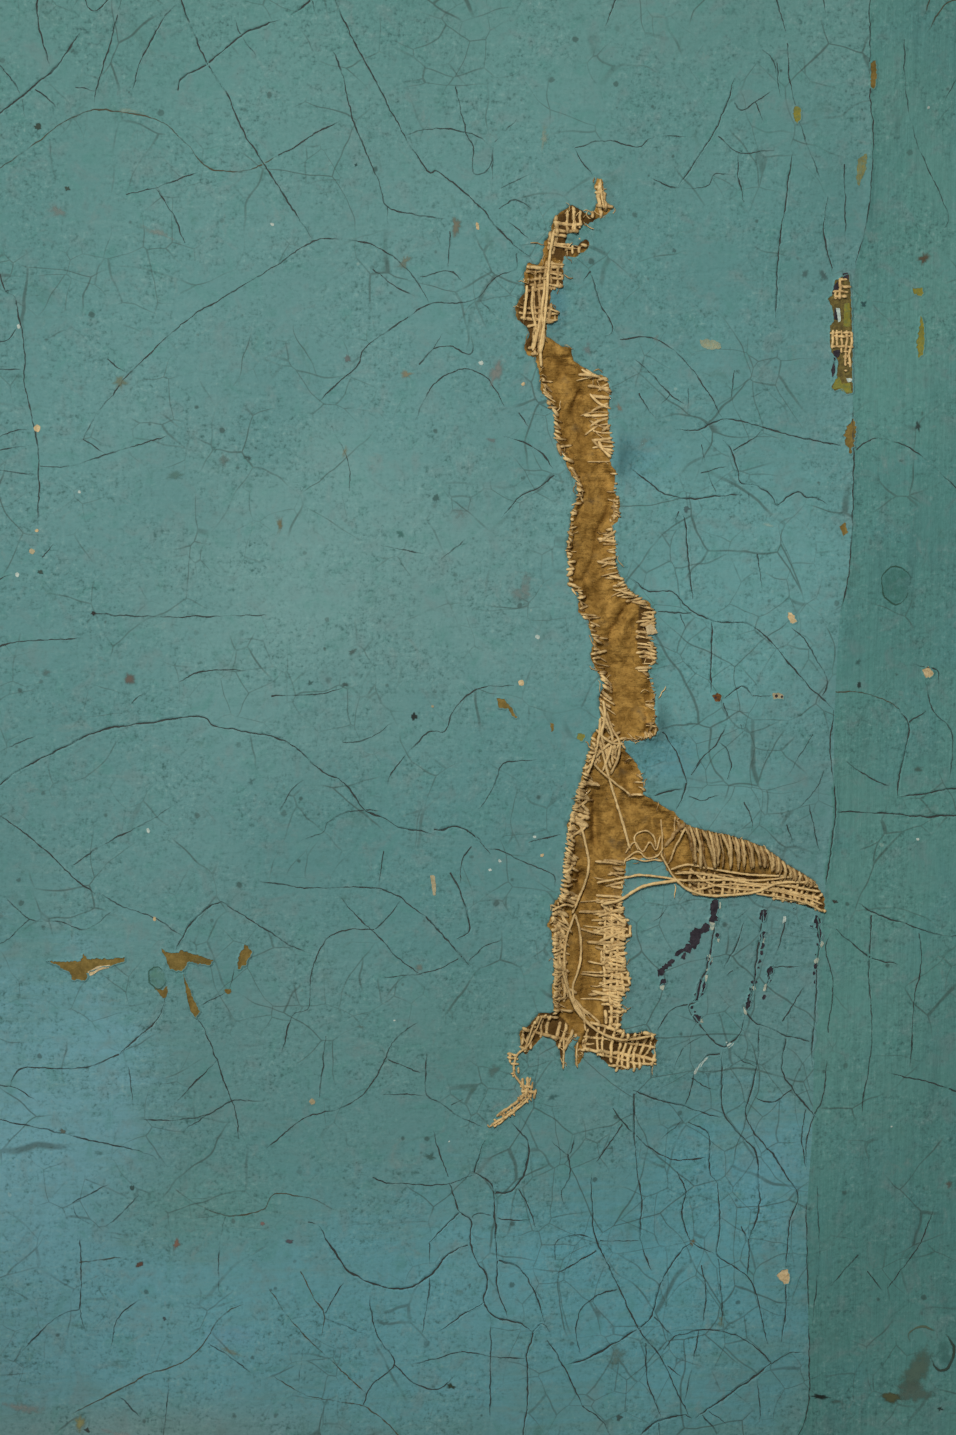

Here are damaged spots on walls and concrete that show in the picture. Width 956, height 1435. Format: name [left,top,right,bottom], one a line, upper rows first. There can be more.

crack [573,0,956,318]
crack [0,275,163,509]
peeling [826,272,855,396]
crack [0,613,262,647]
crack [77,271,956,1435]
peeling [45,952,127,983]
peeling [155,947,215,1020]
peeling [235,942,254,971]
peeling [657,898,721,1026]
peeling [743,902,797,1015]
crack [0,974,244,1149]
crack [30,1242,134,1343]